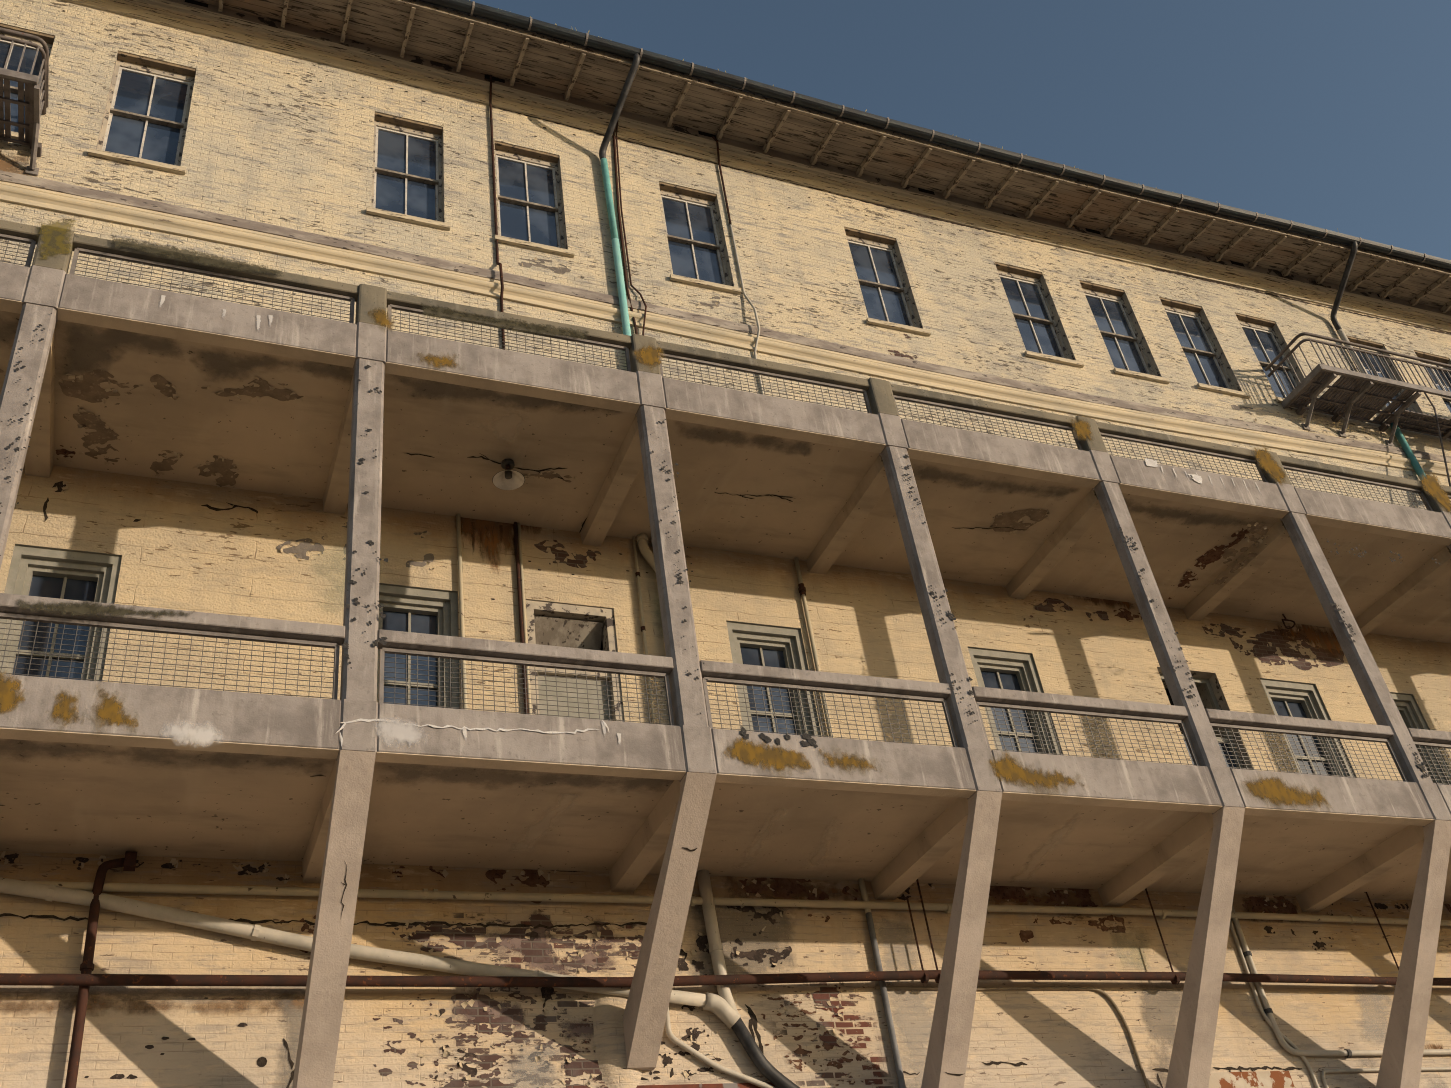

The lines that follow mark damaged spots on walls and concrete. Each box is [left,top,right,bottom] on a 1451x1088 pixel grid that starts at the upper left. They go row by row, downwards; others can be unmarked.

peeling [201,377,304,402]
peeling [56,369,179,466]
peeling [52,481,69,493]
peeling [276,533,328,561]
peeling [406,526,434,570]
spalling [1168,528,1250,599]
peeling [1202,623,1344,671]
peeling [761,982,892,1088]